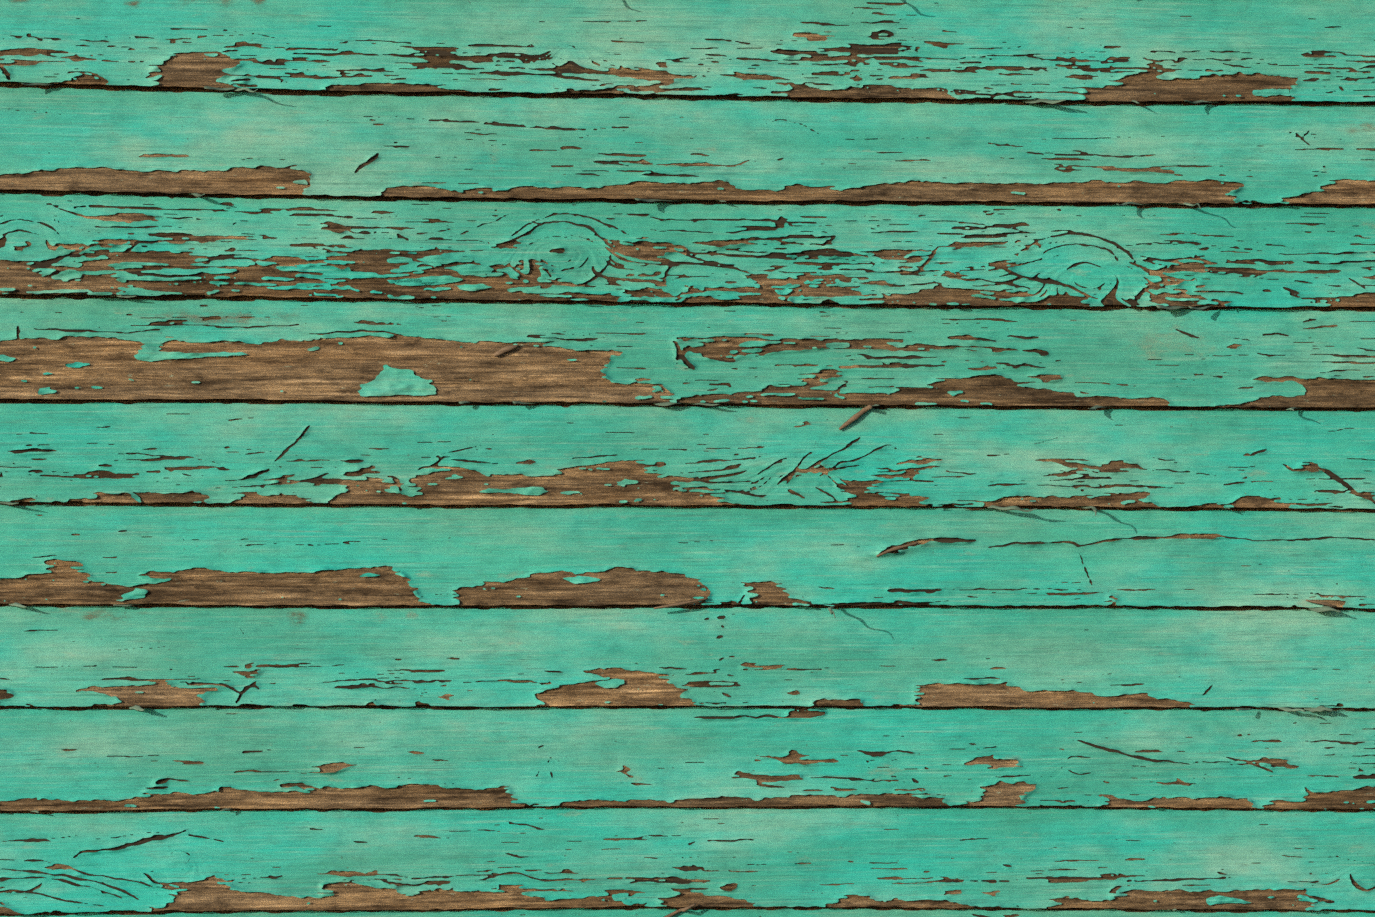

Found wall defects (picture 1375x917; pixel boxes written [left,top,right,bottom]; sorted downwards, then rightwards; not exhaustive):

peeling [1073,69,1304,102]
peeling [0,153,311,195]
peeling [378,160,1244,204]
peeling [0,213,1094,307]
peeling [0,331,1170,430]
peeling [230,459,742,506]
peeling [0,559,714,609]
peeling [535,667,704,706]
peeling [899,678,1195,708]
peeling [0,762,525,811]
peeling [1098,778,1375,809]
peeling [149,870,638,911]